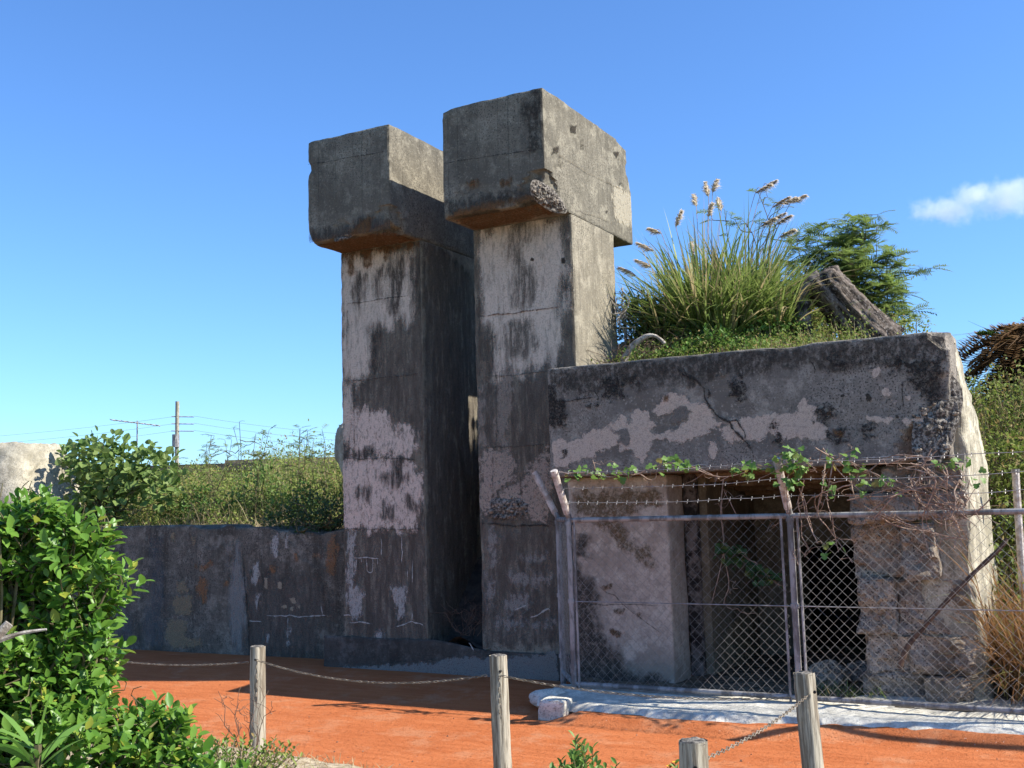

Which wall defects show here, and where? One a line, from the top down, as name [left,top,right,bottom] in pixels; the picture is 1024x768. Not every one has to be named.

rust [316,232,420,275]
rust [454,195,554,229]
peeling [341,247,424,536]
damp [229,215,947,683]
peeling [477,179,831,524]
crack [678,367,754,459]
spalling [865,375,963,468]